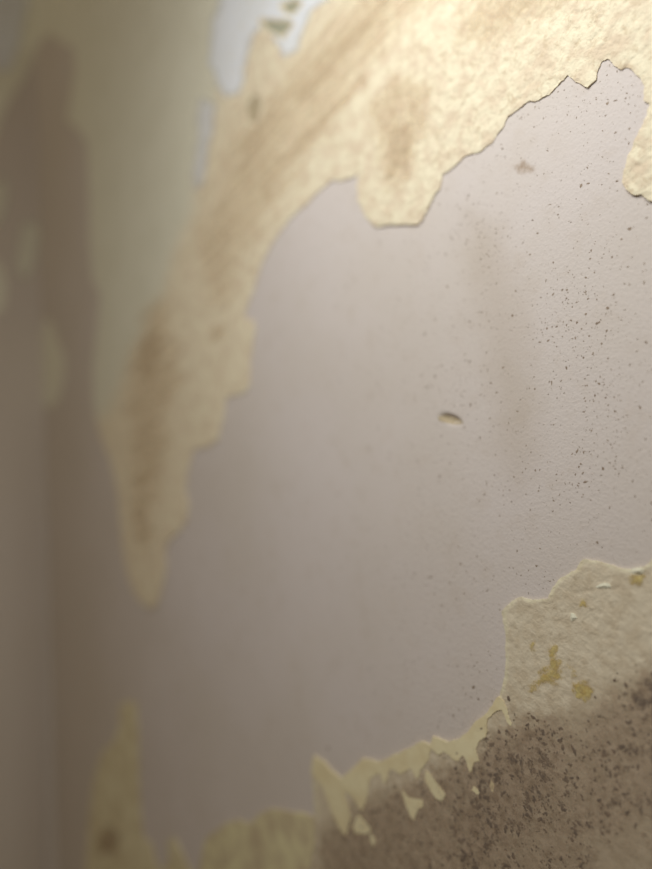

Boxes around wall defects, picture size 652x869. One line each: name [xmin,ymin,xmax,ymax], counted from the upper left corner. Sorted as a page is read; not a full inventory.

peeling [33,0,652,609]
peeling [199,559,652,869]
water stain [314,664,652,869]
water stain [531,645,561,691]